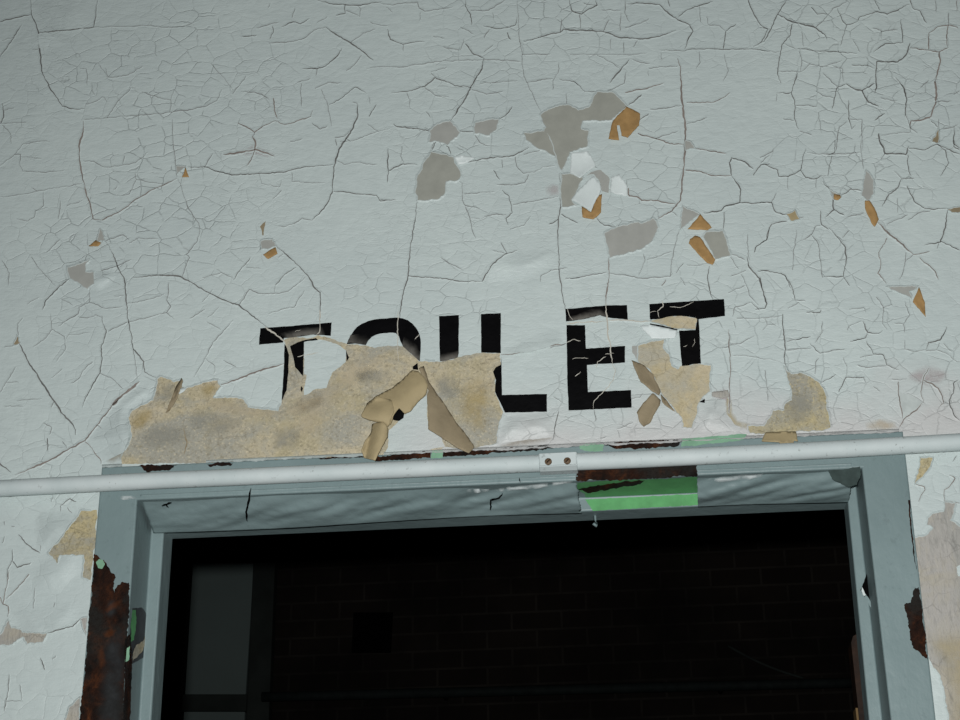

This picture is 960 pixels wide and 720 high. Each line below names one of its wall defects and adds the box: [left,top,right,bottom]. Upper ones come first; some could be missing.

peeling [413,117,500,203]
peeling [522,90,640,219]
crack [0,0,960,476]
peeling [603,216,660,259]
peeling [679,205,732,265]
peeling [121,335,504,464]
peeling [632,316,833,447]
peeling [46,508,97,582]
peeling [576,477,698,511]
rust [79,554,132,720]
rust [904,587,928,659]
peeling [915,500,960,720]